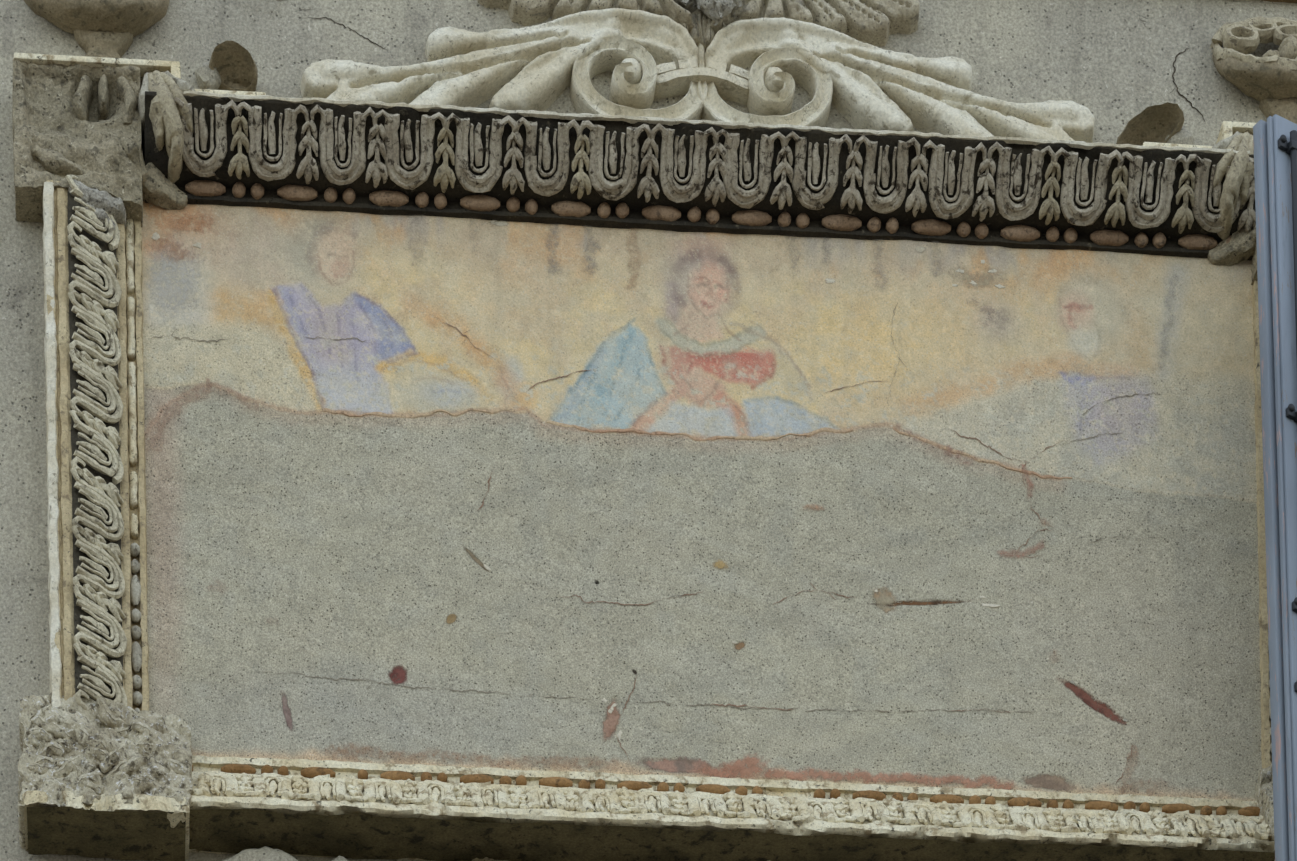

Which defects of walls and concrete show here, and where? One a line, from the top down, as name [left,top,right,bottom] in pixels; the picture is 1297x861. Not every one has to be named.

crack [277,0,387,50]
crack [1168,45,1206,124]
crack [530,368,597,388]
peeling [547,420,853,441]
crack [950,392,1156,558]
crack [559,592,700,606]
crack [774,582,850,604]
spalling [874,588,964,613]
spalling [389,665,407,684]
spalling [1065,680,1129,724]
spalling [643,757,711,773]
spalling [1025,774,1074,792]